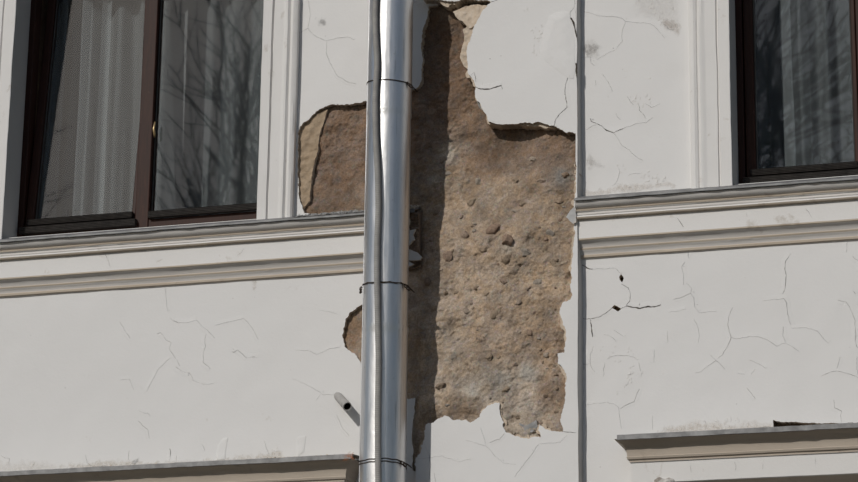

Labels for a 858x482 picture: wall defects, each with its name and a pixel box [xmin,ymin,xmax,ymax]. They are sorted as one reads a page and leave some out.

crack [469,68,502,90]
crack [554,78,571,127]
spalling [298,104,367,214]
crack [587,115,653,163]
spalling [407,4,577,471]
spalling [344,307,362,362]
crack [166,449,177,463]
crack [418,444,470,482]